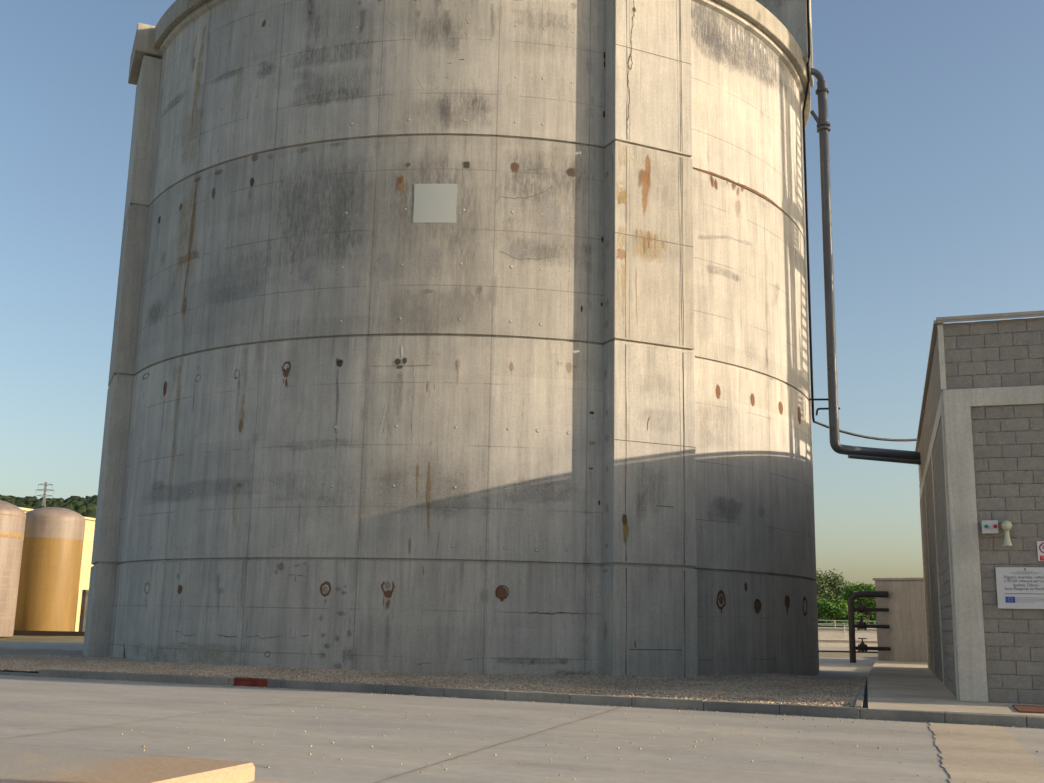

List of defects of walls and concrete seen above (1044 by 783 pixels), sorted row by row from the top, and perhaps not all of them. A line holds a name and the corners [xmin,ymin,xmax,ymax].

damp [691,4,780,84]
rust [381,582,394,608]
rust [495,585,509,601]
rust [716,590,726,613]